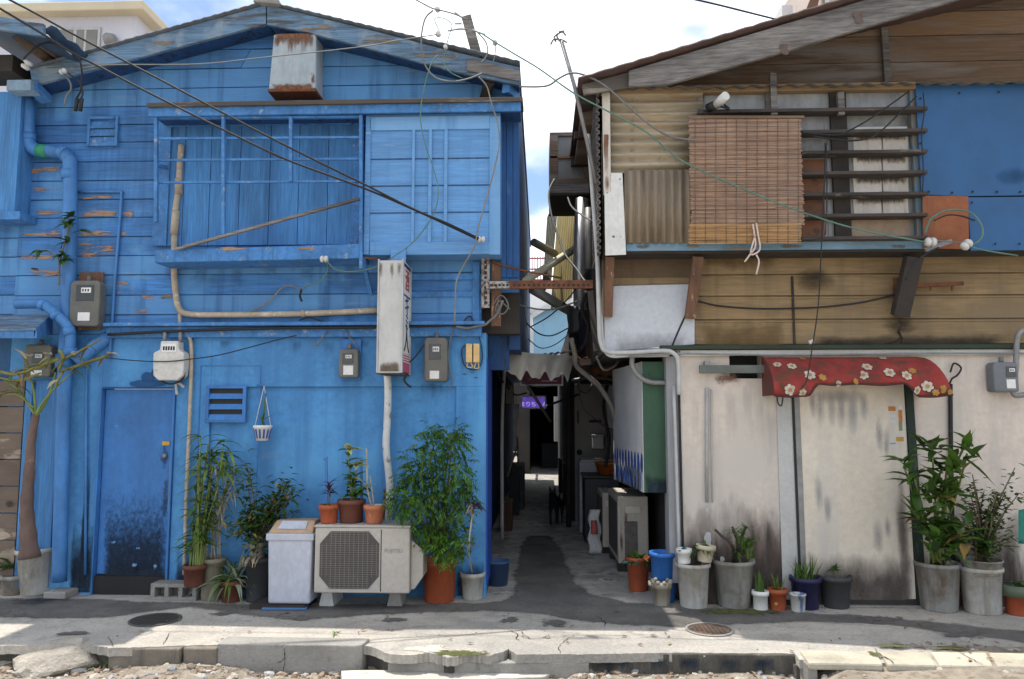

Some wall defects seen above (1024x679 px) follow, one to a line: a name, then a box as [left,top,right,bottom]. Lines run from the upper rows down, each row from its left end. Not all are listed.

rust [276,33,311,47]
rust [274,76,314,89]
peeling [81,195,133,217]
peeling [79,231,126,258]
peeling [21,255,58,276]
leakage [107,521,161,576]
leakage [691,524,782,605]